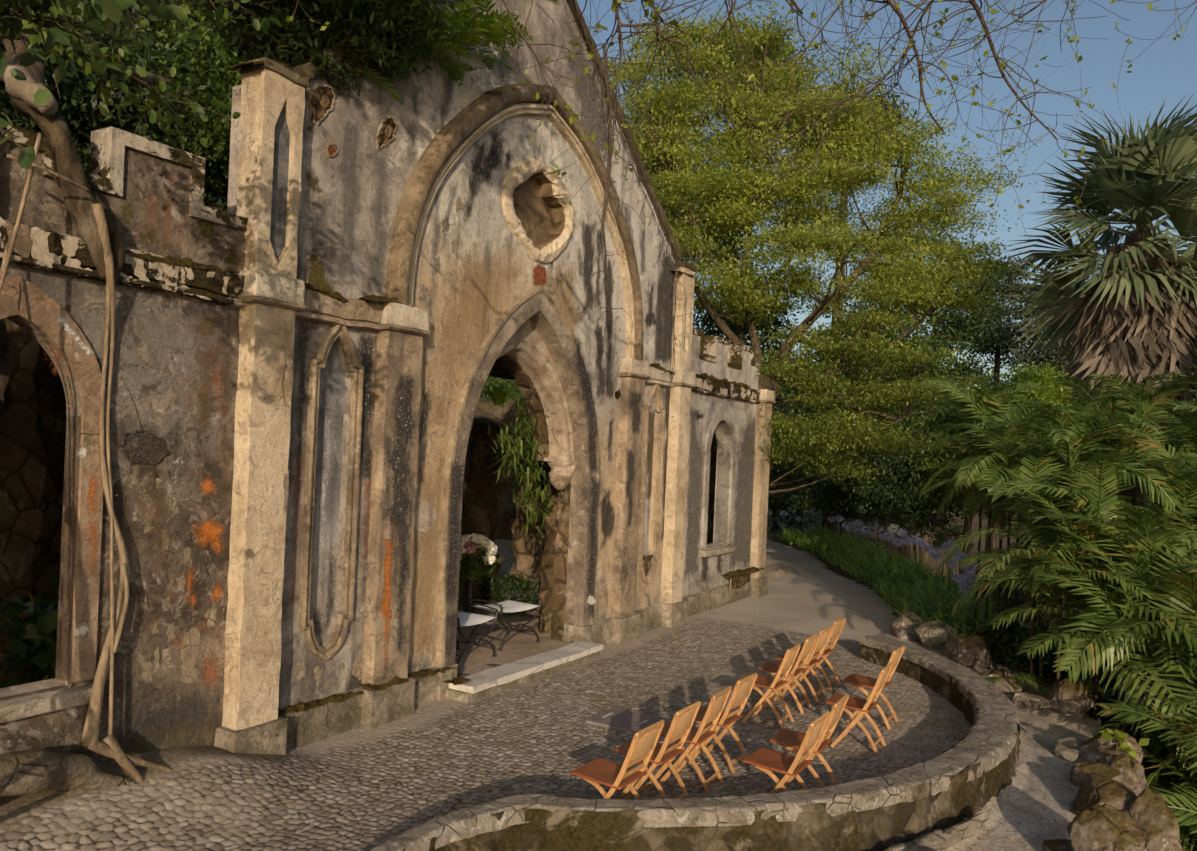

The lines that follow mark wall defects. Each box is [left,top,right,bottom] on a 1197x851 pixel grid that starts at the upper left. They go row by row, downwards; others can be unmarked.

flaking render [306,82,337,126]
flaking render [375,113,398,151]
peeling [0,216,92,276]
peeling [119,256,229,300]
damp [434,128,511,260]
damp [557,146,676,616]
rust [201,480,215,494]
rust [195,520,223,552]
damp [357,334,377,558]
damp [385,375,465,657]
flaking render [141,547,216,684]
rust [380,541,394,661]